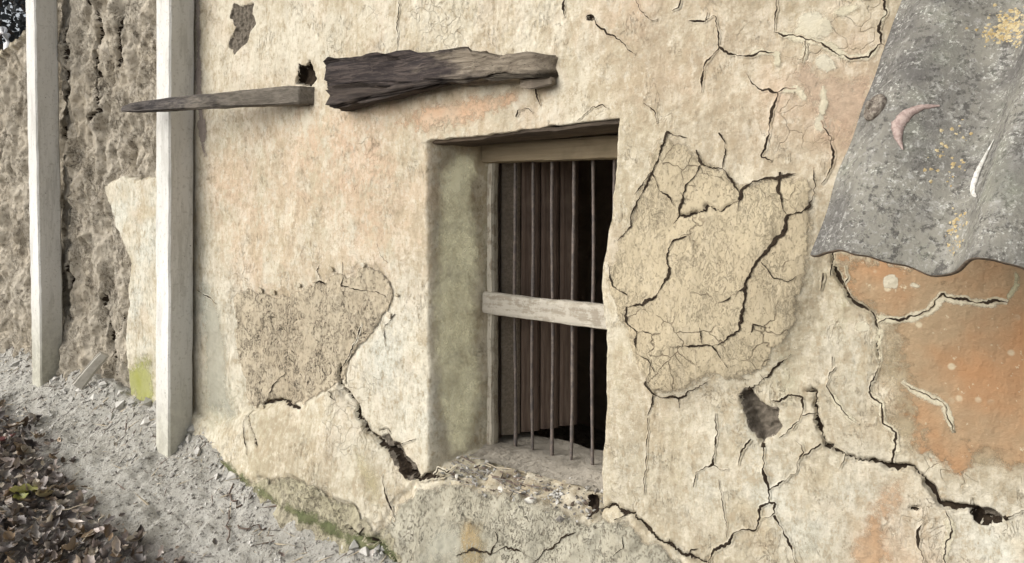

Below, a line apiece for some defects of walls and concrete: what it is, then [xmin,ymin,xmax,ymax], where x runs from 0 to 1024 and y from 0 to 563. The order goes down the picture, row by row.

spalling [229,3,256,55]
spalling [297,62,317,86]
crack [243,373,301,455]
spalling [233,263,399,409]
crack [314,262,457,556]
crack [457,0,1024,563]
spalling [738,387,783,443]
peeling [838,254,1024,475]
spalling [246,433,681,563]
spalling [970,506,1003,519]